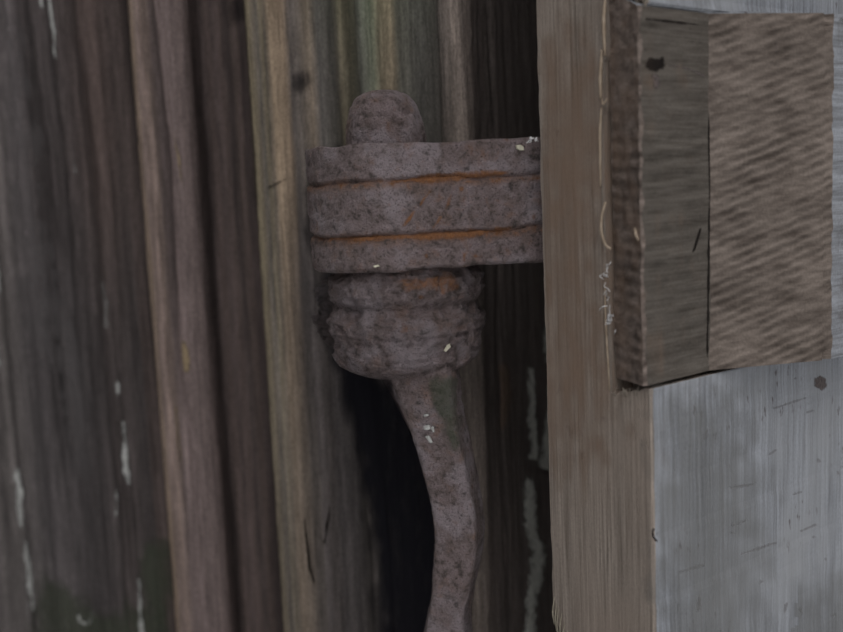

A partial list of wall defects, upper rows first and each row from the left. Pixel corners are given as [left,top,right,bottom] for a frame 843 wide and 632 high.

corrosion [391,171,505,190]